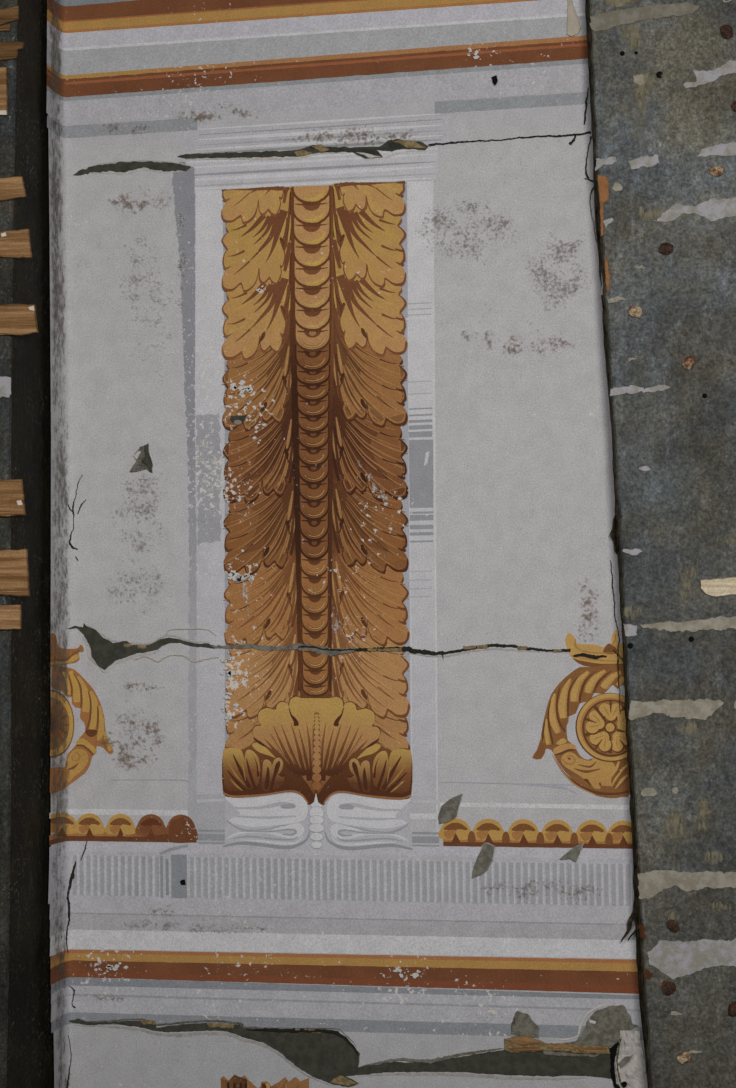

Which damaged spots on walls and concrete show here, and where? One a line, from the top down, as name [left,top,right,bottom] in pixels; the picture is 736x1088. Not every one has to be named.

spalling [130,444,153,473]
crack [68,476,86,561]
crack [68,560,623,714]
spalling [438,793,463,824]
spalling [472,843,495,878]
spalling [560,844,584,862]
crack [66,841,87,952]
spalling [511,1011,539,1038]
spalling [557,1003,637,1047]